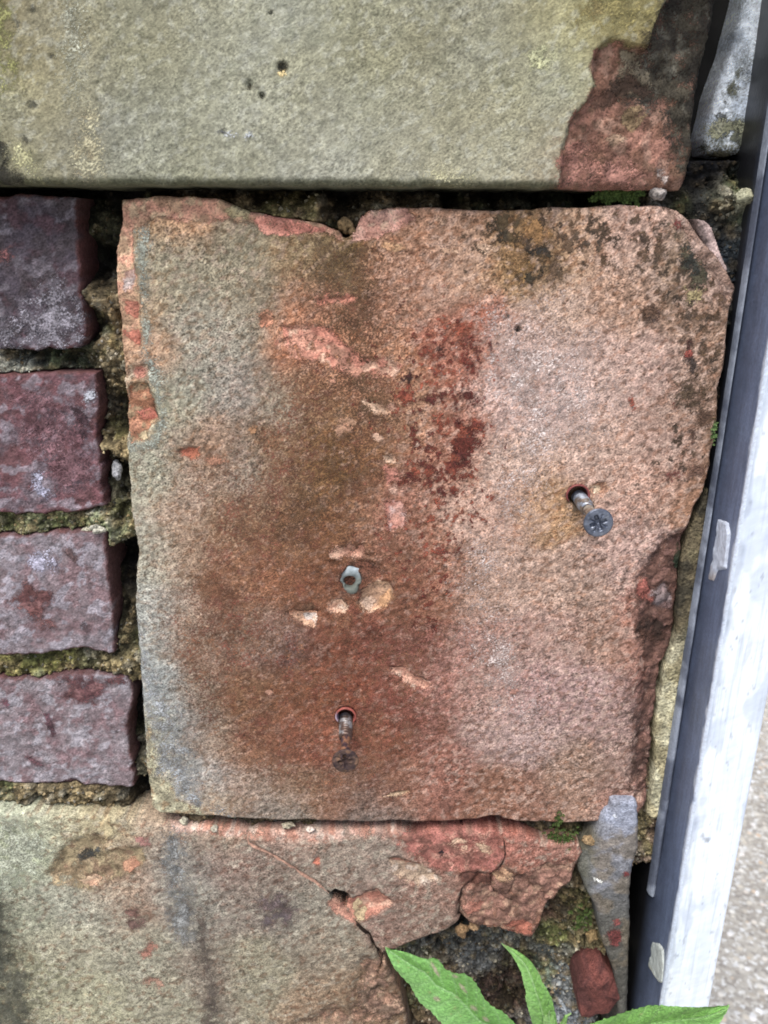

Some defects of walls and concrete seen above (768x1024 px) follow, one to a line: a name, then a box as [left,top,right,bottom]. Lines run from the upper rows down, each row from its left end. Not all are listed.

spalling [556,0,715,193]
damp [462,206,732,402]
damp [652,424,710,482]
corrosion [157,237,465,817]
crack [247,822,330,893]
spalling [164,814,578,937]
crack [355,920,383,968]